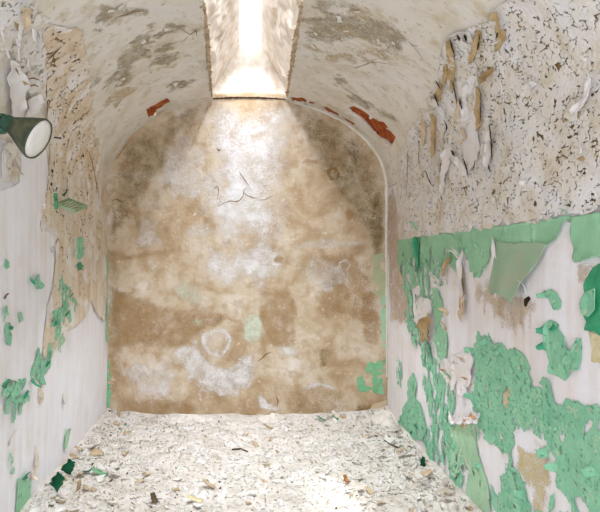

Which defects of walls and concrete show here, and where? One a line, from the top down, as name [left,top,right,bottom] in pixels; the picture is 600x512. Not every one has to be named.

flaking render [0,0,109,512]
crack [214,172,273,206]
damp [108,100,385,415]
peeling [372,0,600,512]